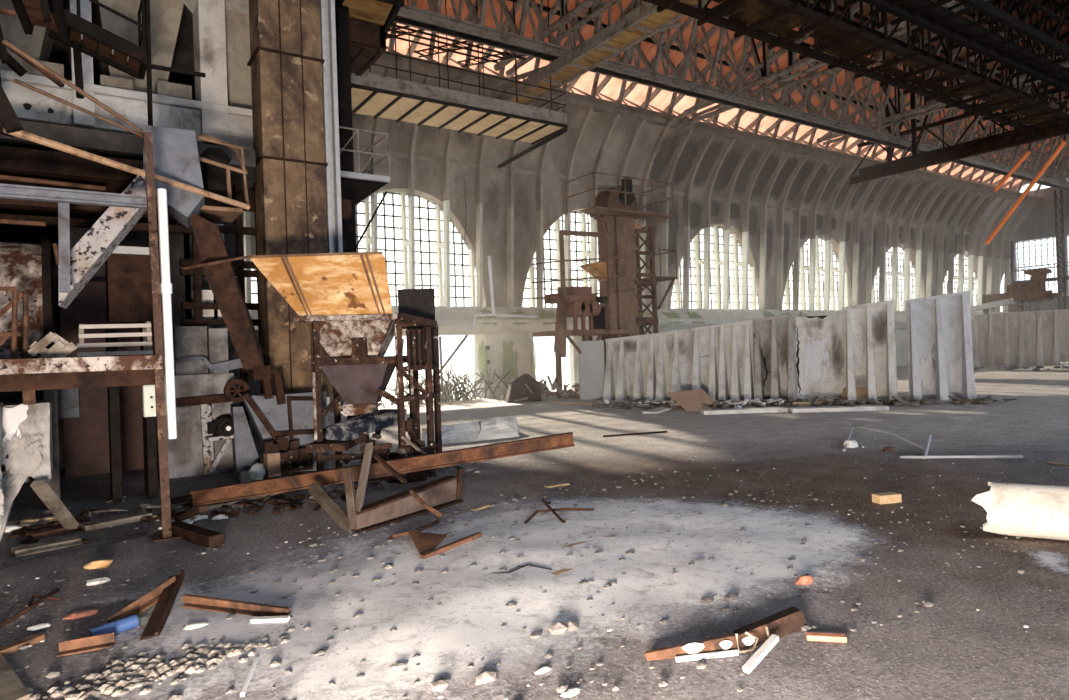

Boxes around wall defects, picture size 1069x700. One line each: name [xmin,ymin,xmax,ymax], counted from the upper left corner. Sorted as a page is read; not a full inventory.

spalling [0,404,44,540]